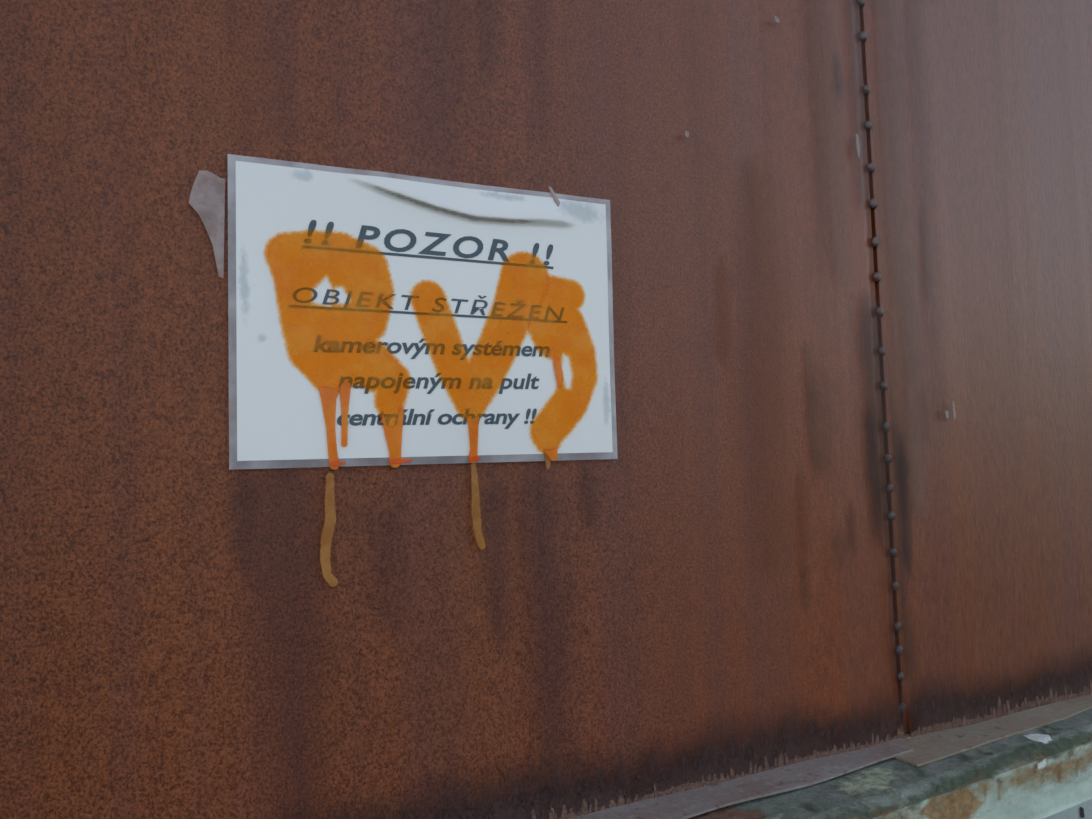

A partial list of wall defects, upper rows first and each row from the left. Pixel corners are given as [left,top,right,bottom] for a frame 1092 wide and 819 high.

water stain [367,662,1092,819]